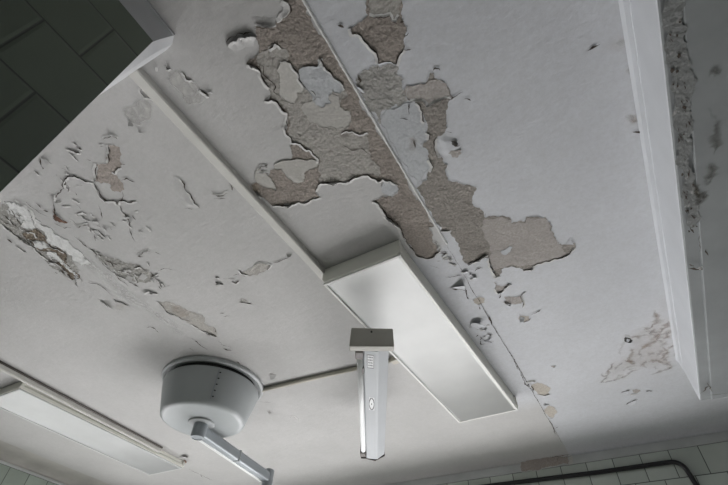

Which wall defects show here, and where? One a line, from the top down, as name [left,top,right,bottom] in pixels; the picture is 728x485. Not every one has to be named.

peeling [90,134,133,193]
peeling [215,0,577,322]
peeling [661,0,701,233]
spalling [0,200,91,287]
crack [53,166,172,289]
peeling [144,291,218,338]
crack [439,246,561,441]
peeling [525,380,558,418]